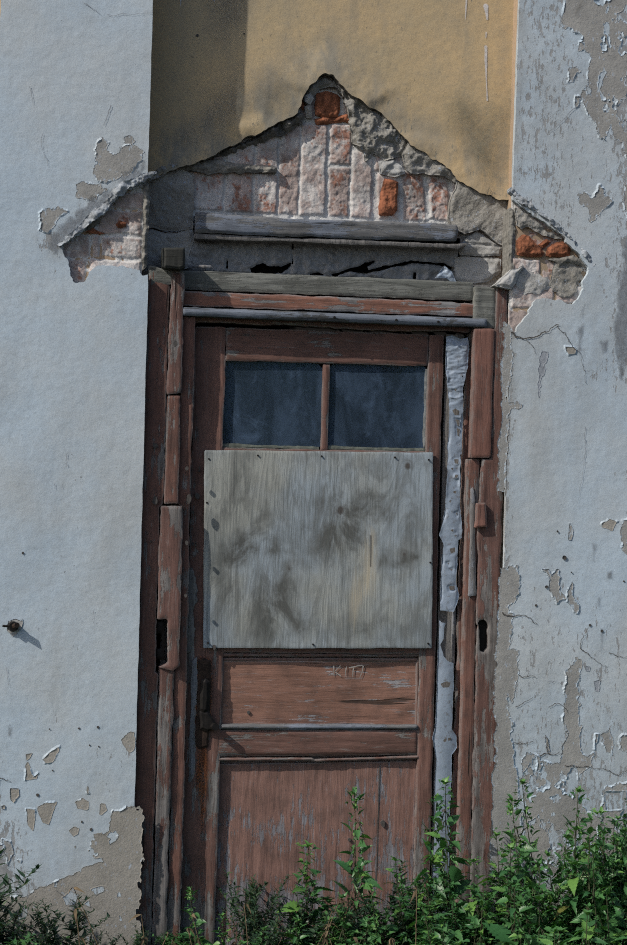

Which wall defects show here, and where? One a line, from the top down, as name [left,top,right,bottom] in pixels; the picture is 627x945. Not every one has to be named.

peeling [560,0,627,160]
spalling [37,76,586,492]
crack [511,324,587,384]
peeling [603,242,627,377]
peeling [600,517,627,555]
peeling [1,744,61,809]
peeling [121,731,135,753]
peeling [488,565,627,924]
peeling [0,786,145,945]